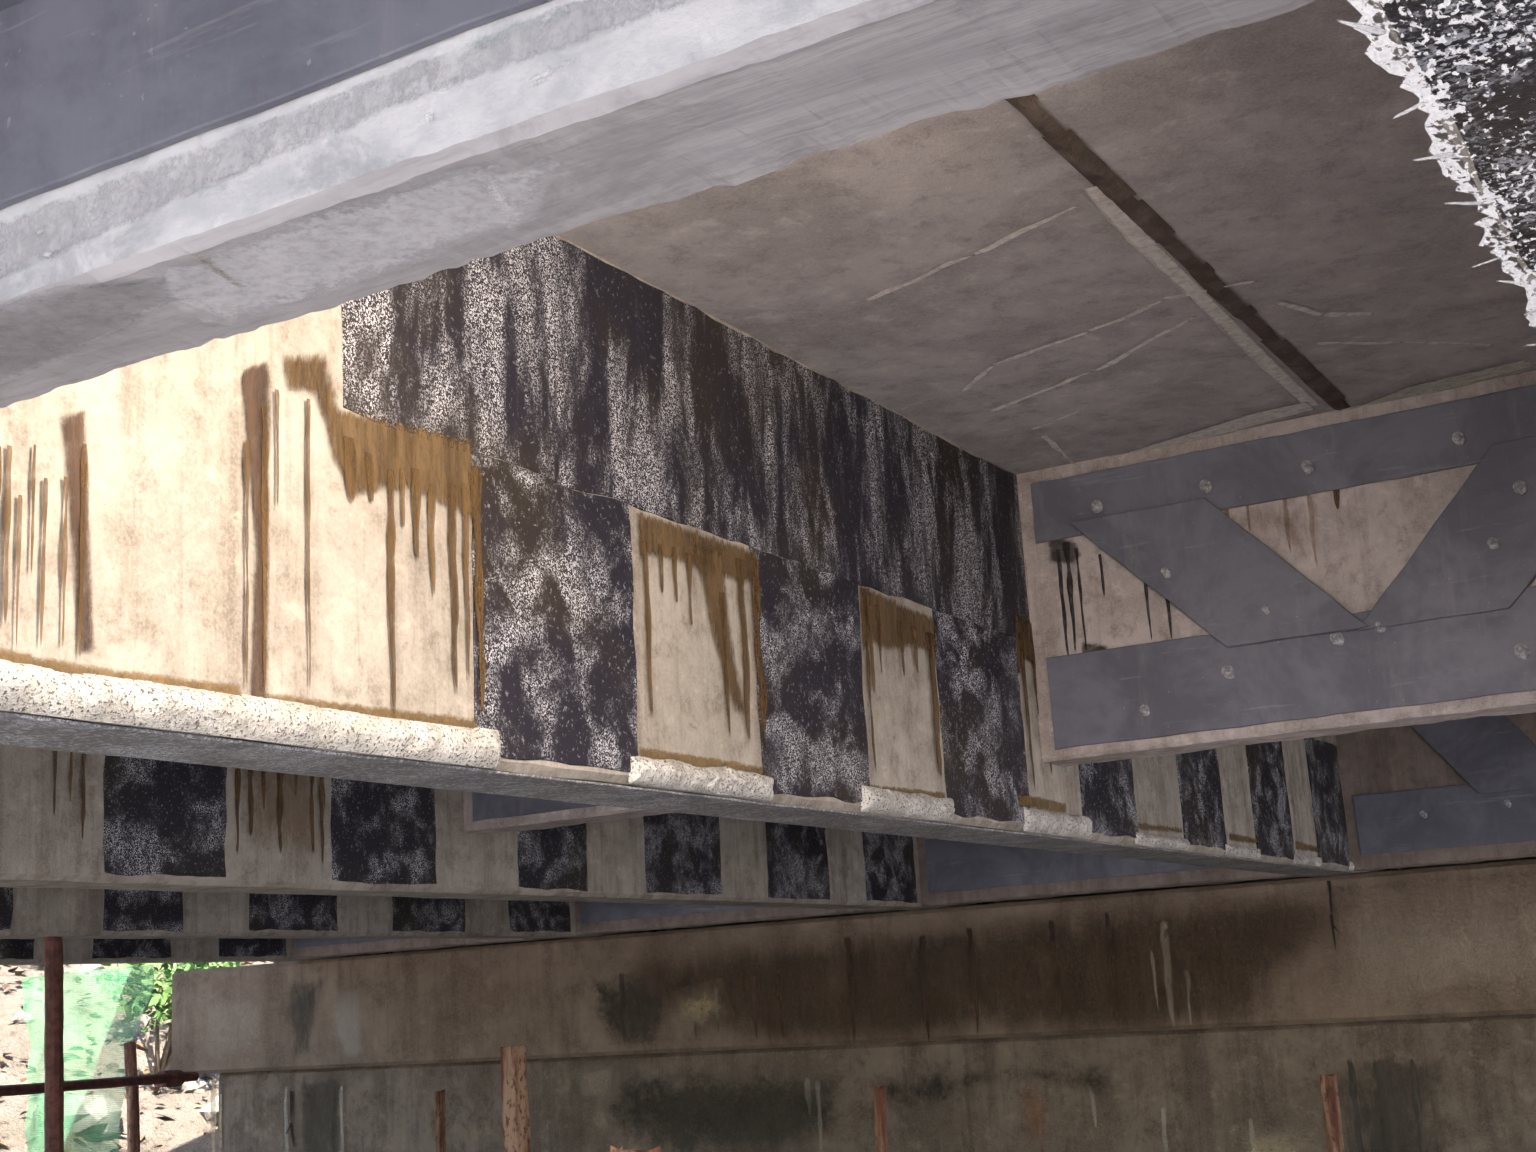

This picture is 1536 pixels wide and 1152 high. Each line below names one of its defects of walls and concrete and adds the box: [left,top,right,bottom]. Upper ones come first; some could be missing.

rust [0,354,486,728]
rust [638,512,768,748]
rust [860,586,945,798]
rust [641,749,764,775]
water stain [619,905,1312,1043]
crack [1327,881,1343,950]
water stain [1340,1060,1439,1152]